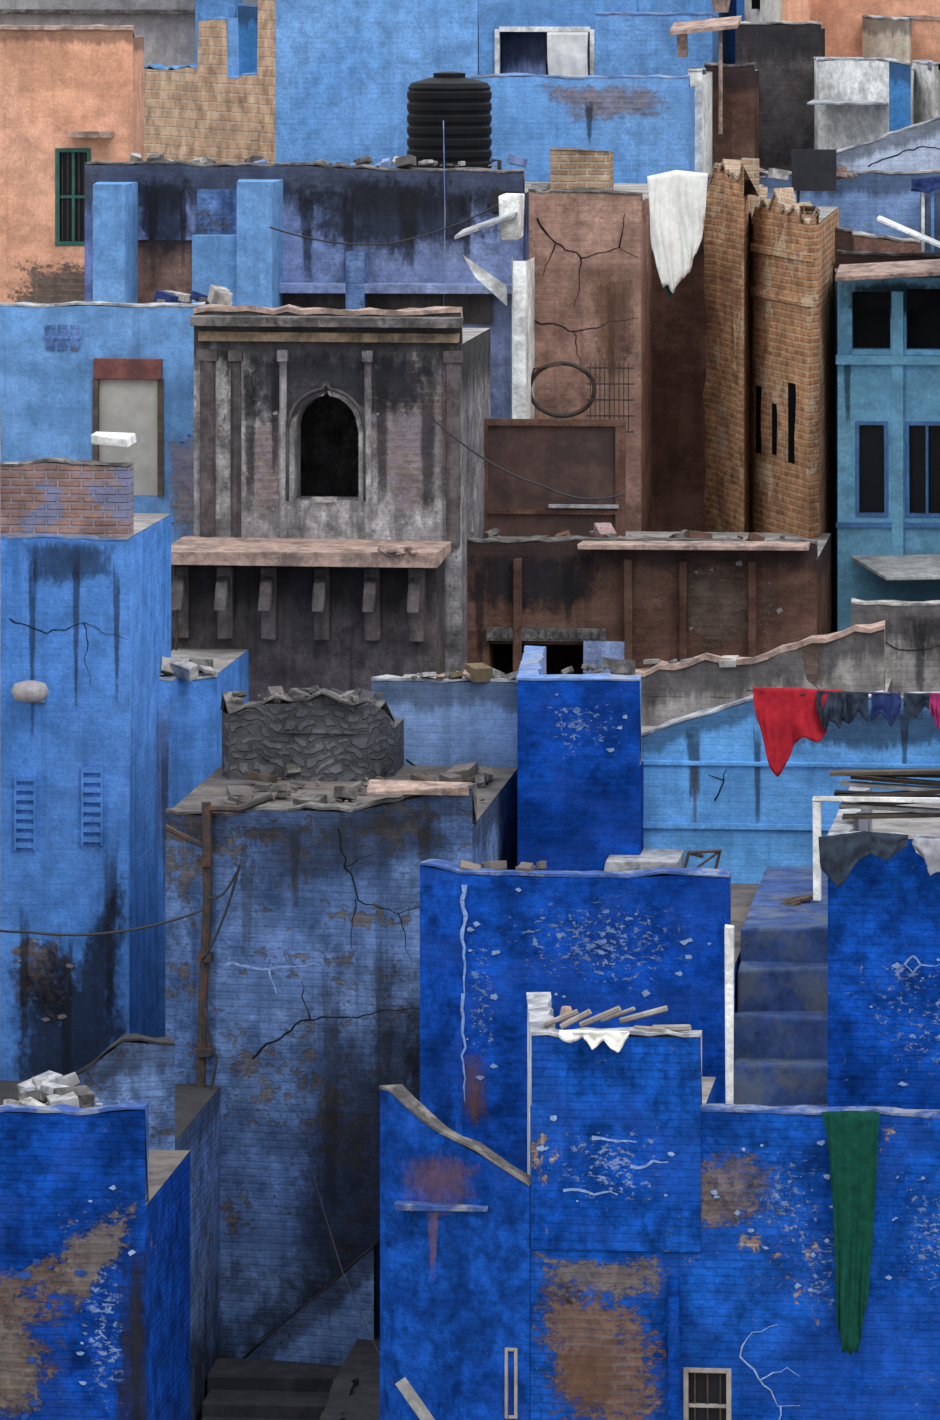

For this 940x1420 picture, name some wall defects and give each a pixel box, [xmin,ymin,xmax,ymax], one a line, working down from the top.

crack [534,214,638,364]
crack [337,828,420,963]
crack [226,961,420,1059]
crack [460,885,468,1102]
peeling [0,1203,136,1420]
flaking render [531,1252,668,1420]
flaking render [701,1140,834,1315]
crack [739,1324,800,1420]
peeling [885,1176,940,1298]